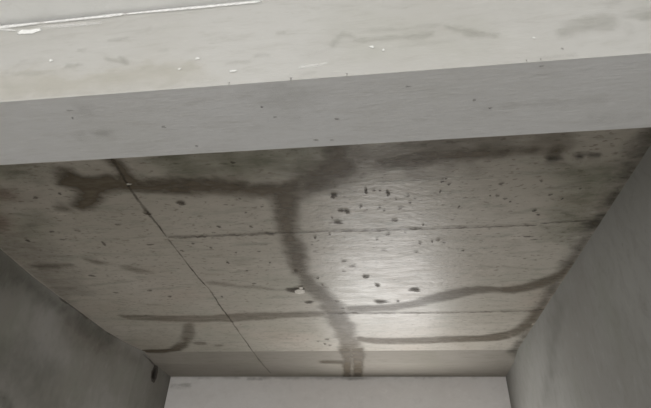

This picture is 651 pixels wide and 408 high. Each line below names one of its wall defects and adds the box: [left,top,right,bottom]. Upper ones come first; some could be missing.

crack [116,165,164,233]
water stain [58,145,574,377]